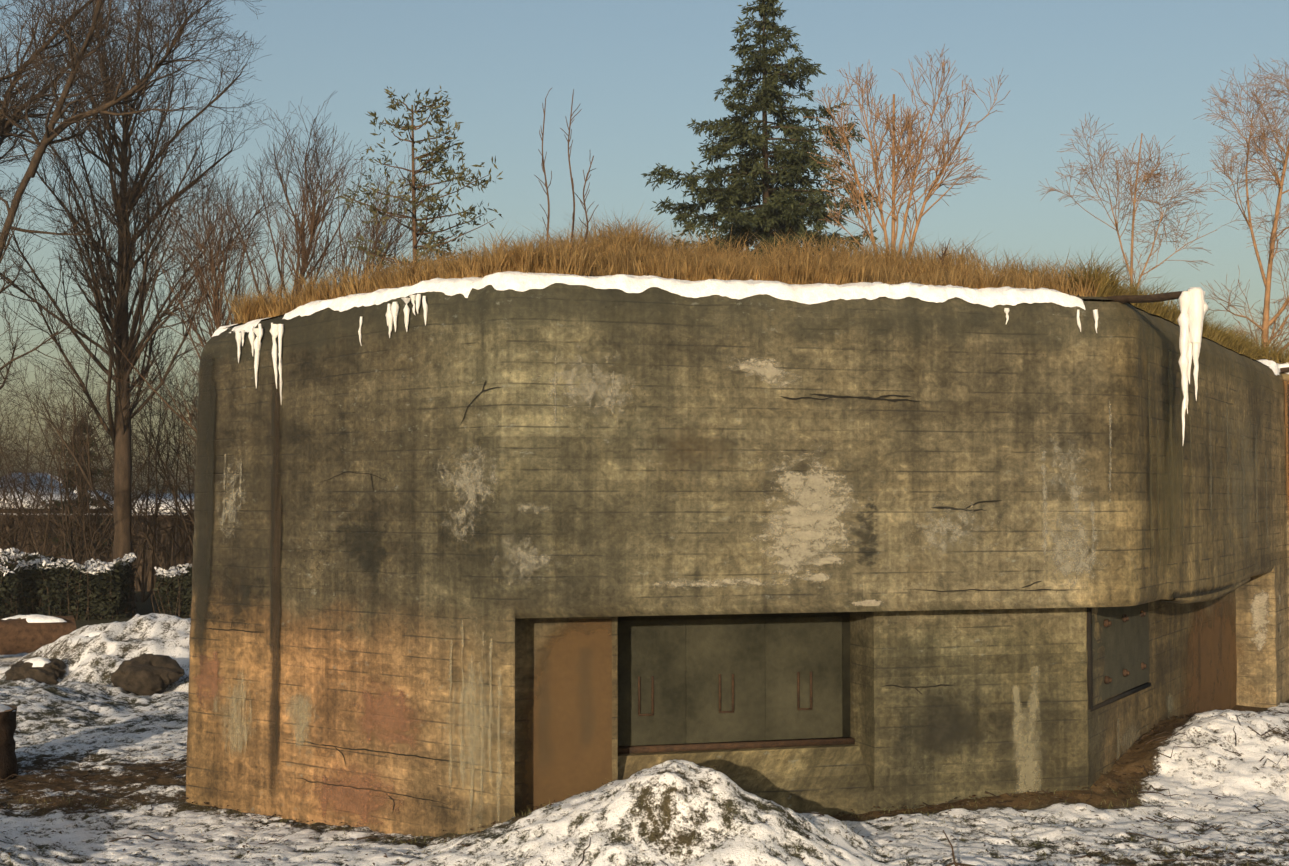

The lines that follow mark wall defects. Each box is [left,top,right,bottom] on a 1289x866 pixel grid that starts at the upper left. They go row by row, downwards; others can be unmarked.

crack [779,394,920,402]
peeling [758,450,865,582]
water stain [1013,666,1041,793]